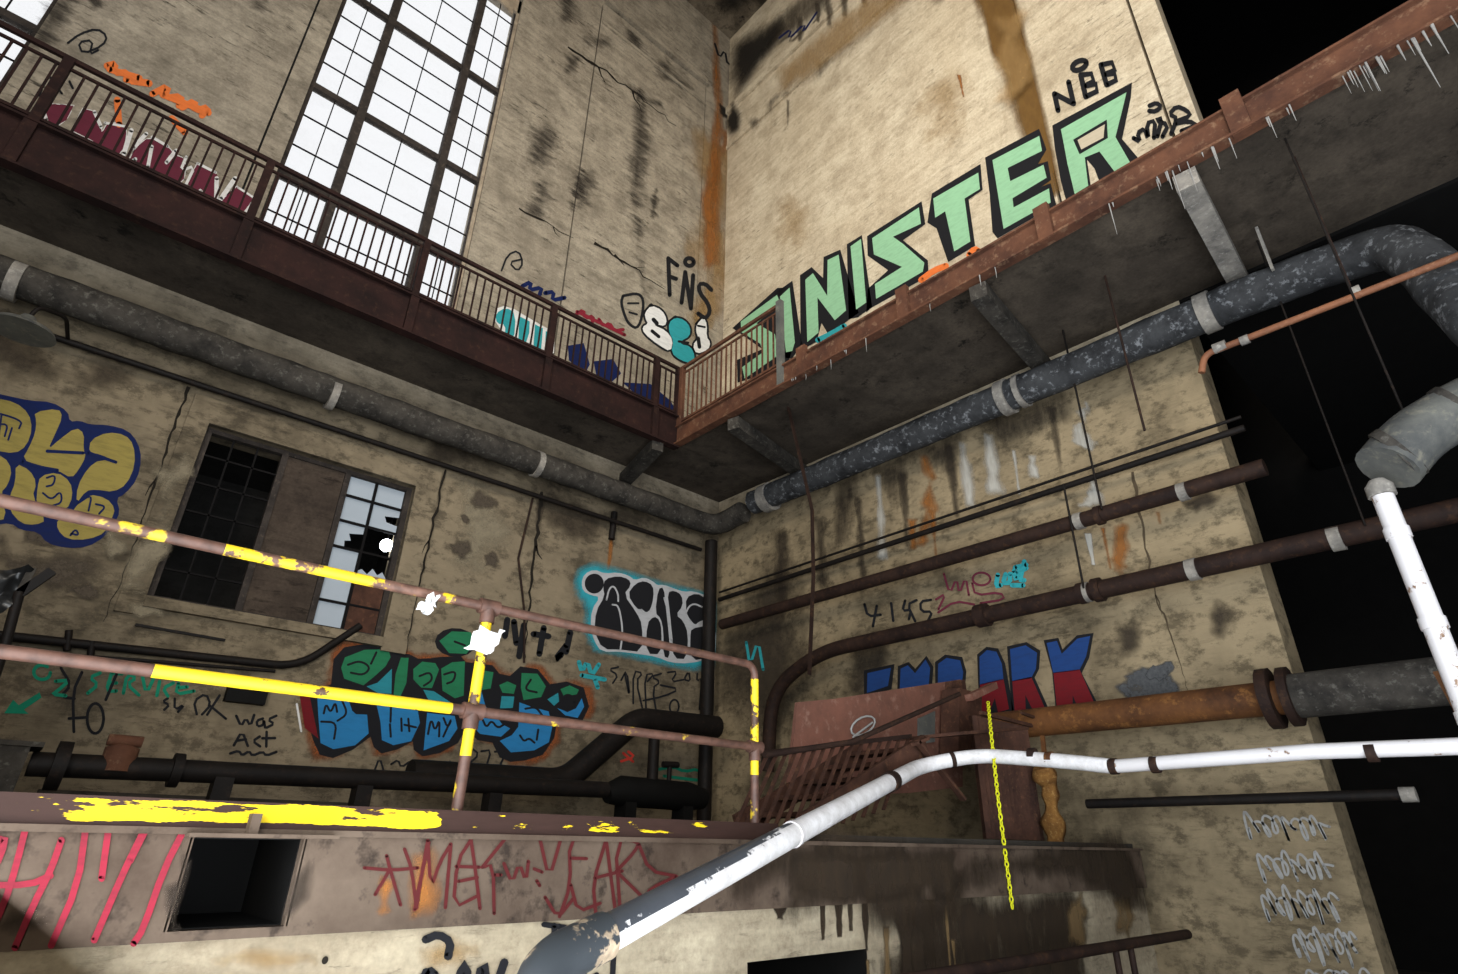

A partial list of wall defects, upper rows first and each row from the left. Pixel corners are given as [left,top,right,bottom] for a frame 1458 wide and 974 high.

rust [702,25,727,265]
damp [767,0,896,114]
damp [975,0,1059,196]